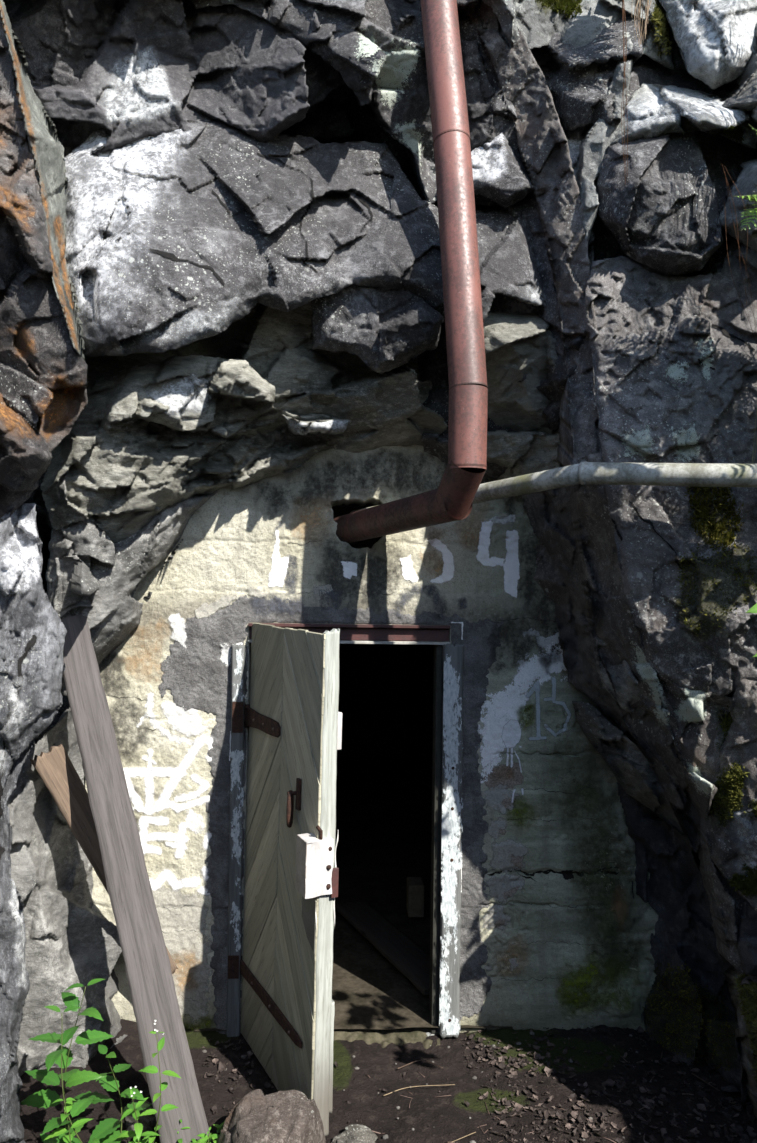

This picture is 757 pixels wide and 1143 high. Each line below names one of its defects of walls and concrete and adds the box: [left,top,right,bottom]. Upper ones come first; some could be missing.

water stain [318,542,400,607]
flaking render [168,587,266,648]
peeling [220,643,245,701]
peeling [161,701,210,737]
peeling [478,628,570,839]
peeling [186,809,204,834]
peeling [230,749,244,952]
peeling [439,654,463,1035]
crack [487,866,622,908]